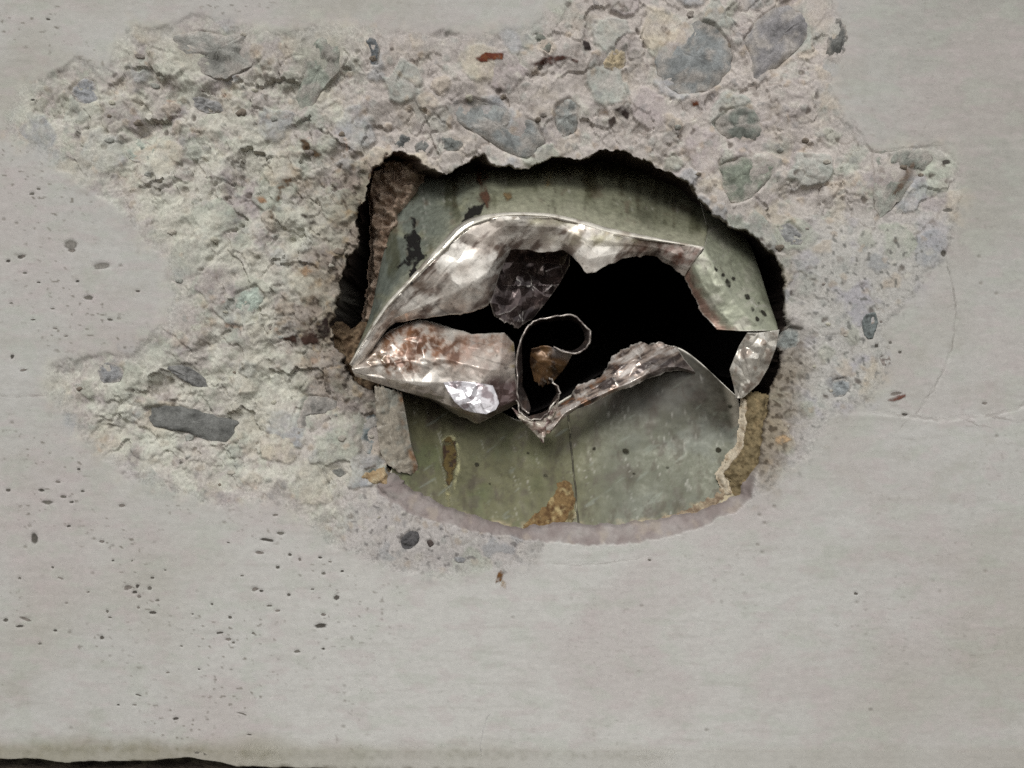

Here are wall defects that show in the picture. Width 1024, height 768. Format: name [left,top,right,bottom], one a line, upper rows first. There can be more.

corrosion [442,436,460,496]
spalling [4,0,963,580]